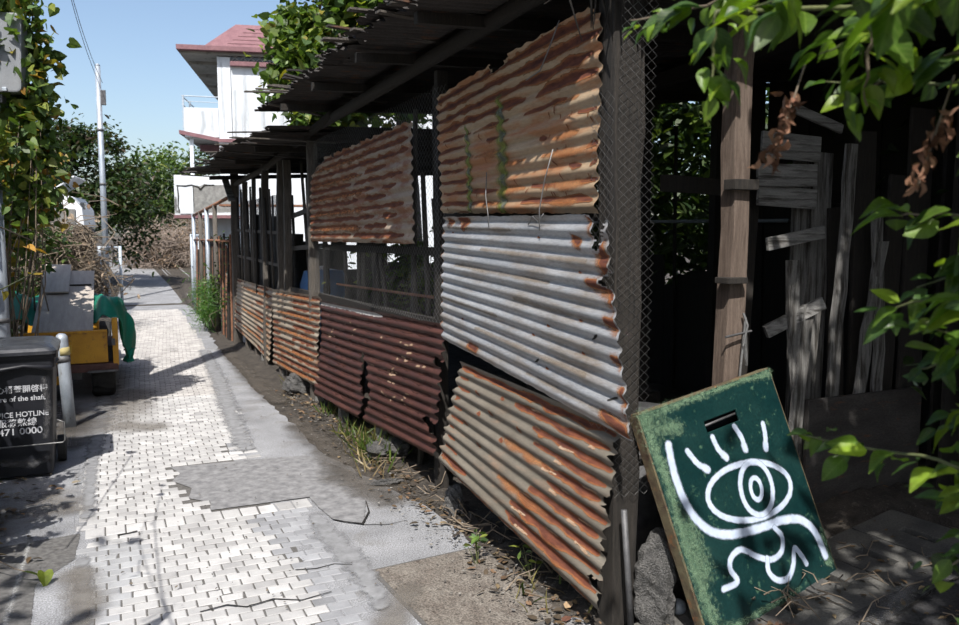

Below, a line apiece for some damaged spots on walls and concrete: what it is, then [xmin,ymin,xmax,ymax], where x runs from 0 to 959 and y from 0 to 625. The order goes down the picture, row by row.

rust [310,125,409,243]
rust [438,14,602,234]
rust [571,215,619,335]
rust [235,280,442,435]
crack [331,501,405,525]
rust [441,366,630,599]